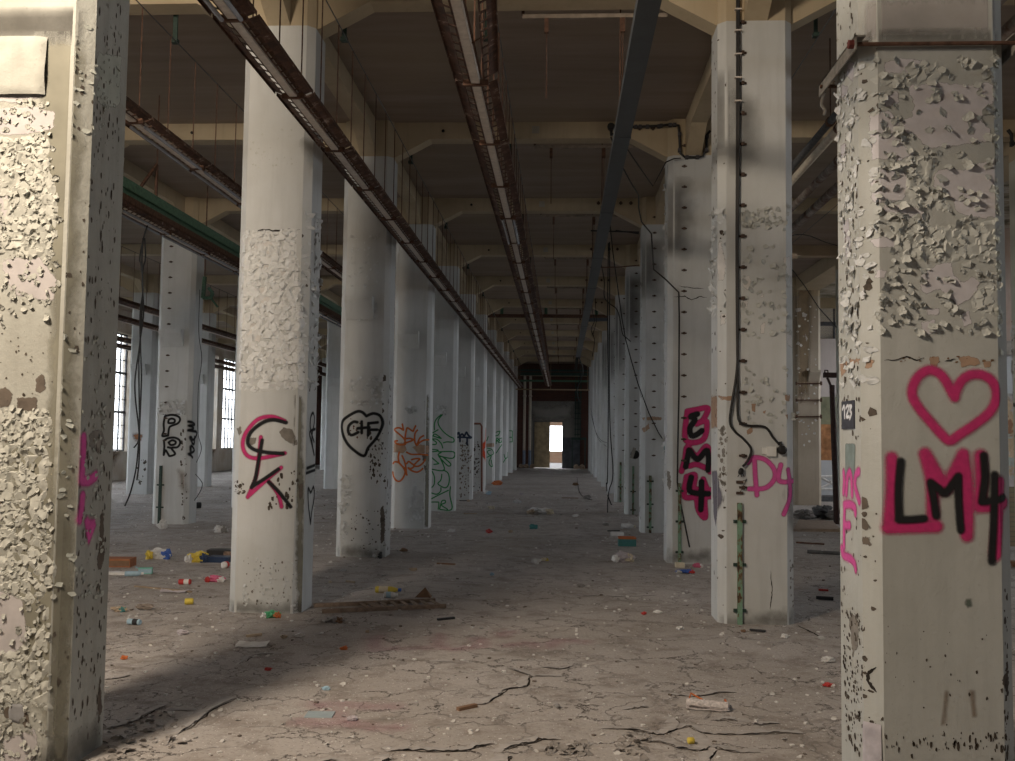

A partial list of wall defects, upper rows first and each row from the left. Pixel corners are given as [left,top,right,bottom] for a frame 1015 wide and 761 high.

peeling [0,3,122,362]
peeling [238,210,323,393]
peeling [834,2,1015,439]
peeling [0,327,114,761]
crack [104,696,238,734]
crack [468,665,573,705]
crack [313,690,803,761]
crack [866,667,877,692]